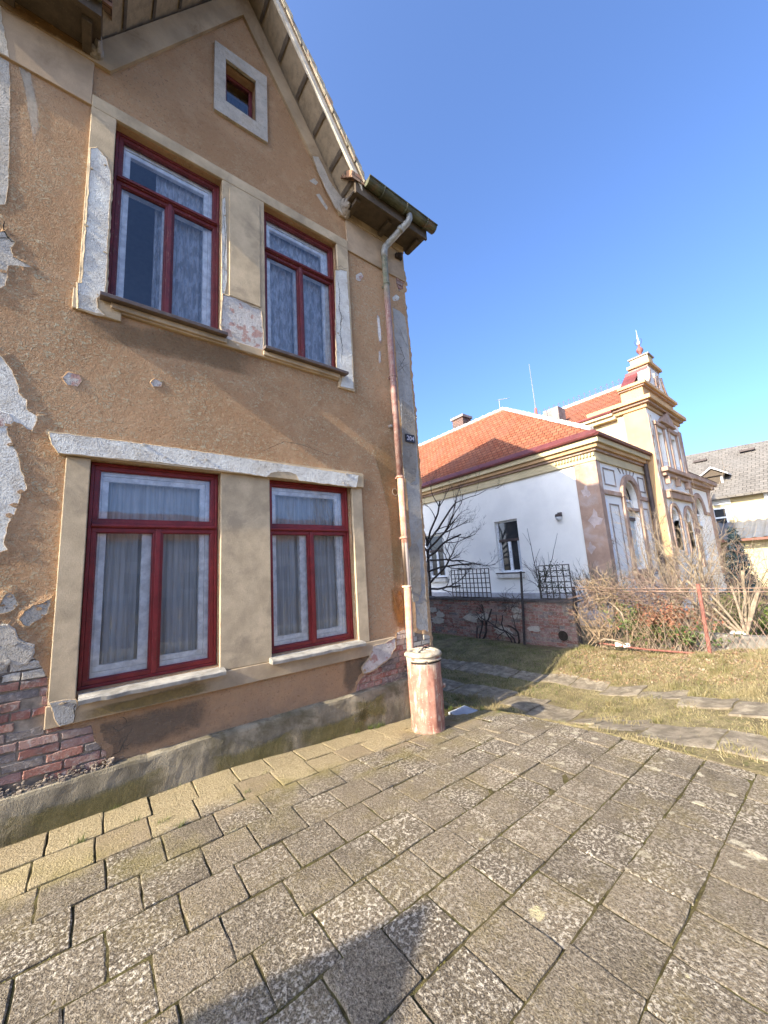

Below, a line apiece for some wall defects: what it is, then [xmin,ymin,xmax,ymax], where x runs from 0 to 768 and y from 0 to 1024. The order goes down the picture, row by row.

flaking render [0,6,12,206]
flaking render [0,227,39,295]
flaking render [220,197,265,354]
flaking render [0,346,359,559]
flaking render [351,271,433,693]
flaking render [0,585,117,793]